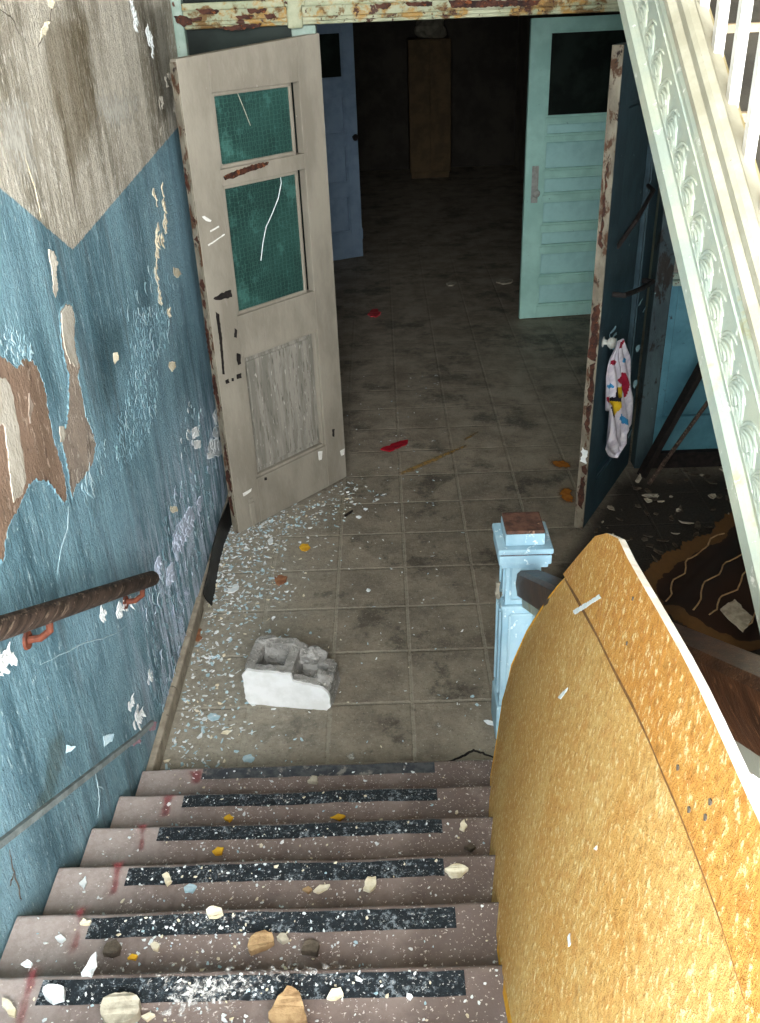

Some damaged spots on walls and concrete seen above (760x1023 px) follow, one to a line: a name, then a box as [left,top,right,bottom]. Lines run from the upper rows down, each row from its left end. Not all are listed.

rust [448,0,541,8]
peeling [152,182,171,318]
rust [598,155,610,249]
flaking render [0,249,97,565]
rust [199,279,220,412]
rust [585,304,601,433]